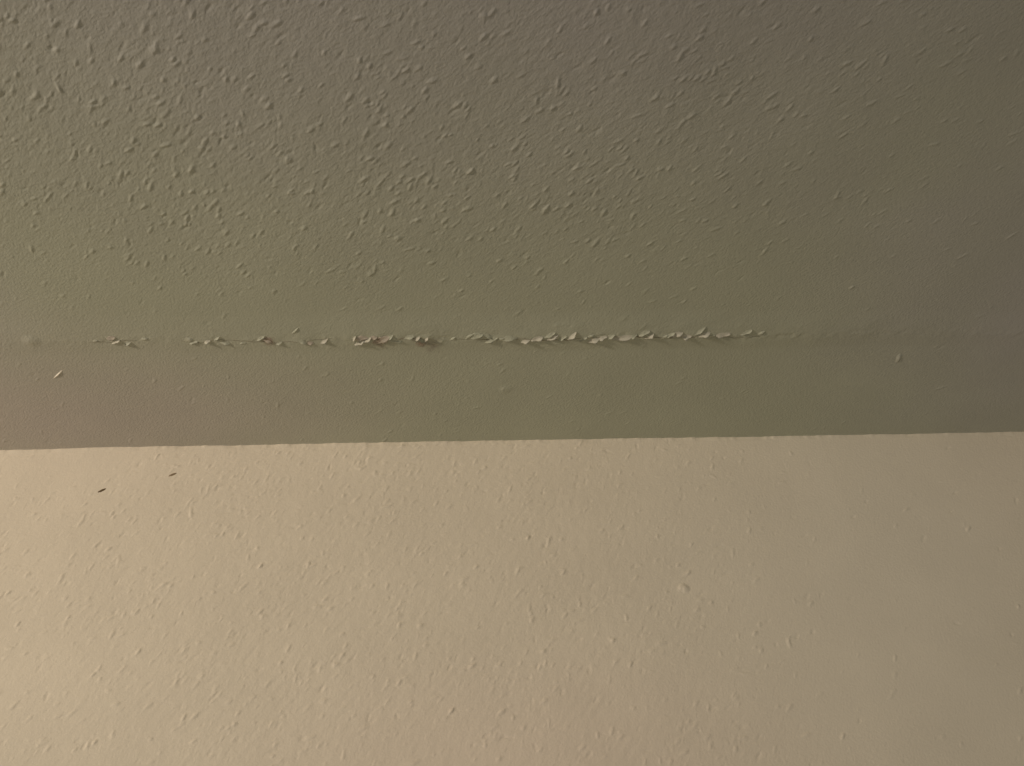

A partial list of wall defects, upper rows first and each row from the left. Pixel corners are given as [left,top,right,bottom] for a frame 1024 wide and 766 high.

peeling [353,335,428,346]
peeling [450,327,766,344]